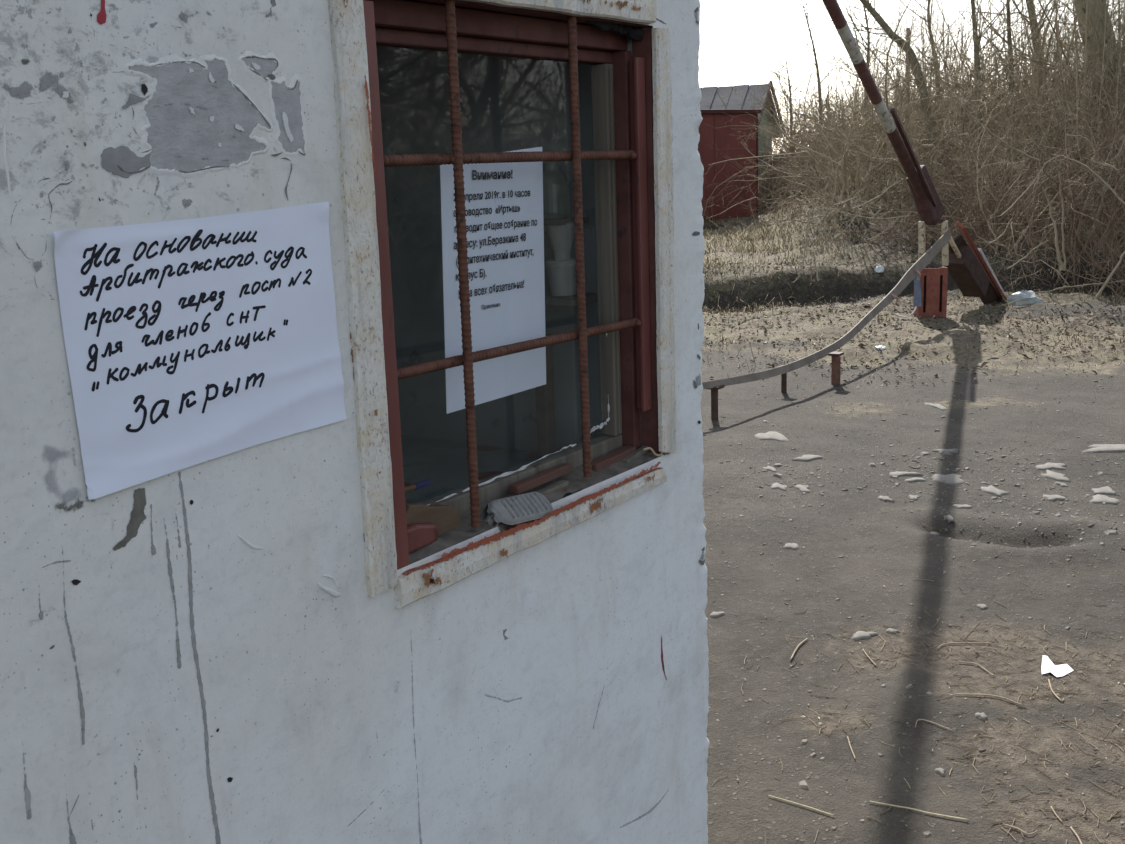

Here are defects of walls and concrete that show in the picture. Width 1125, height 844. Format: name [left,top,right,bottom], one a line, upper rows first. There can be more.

spalling [101,51,308,200]
corrosion [402,462,661,588]
water stain [113,471,221,844]